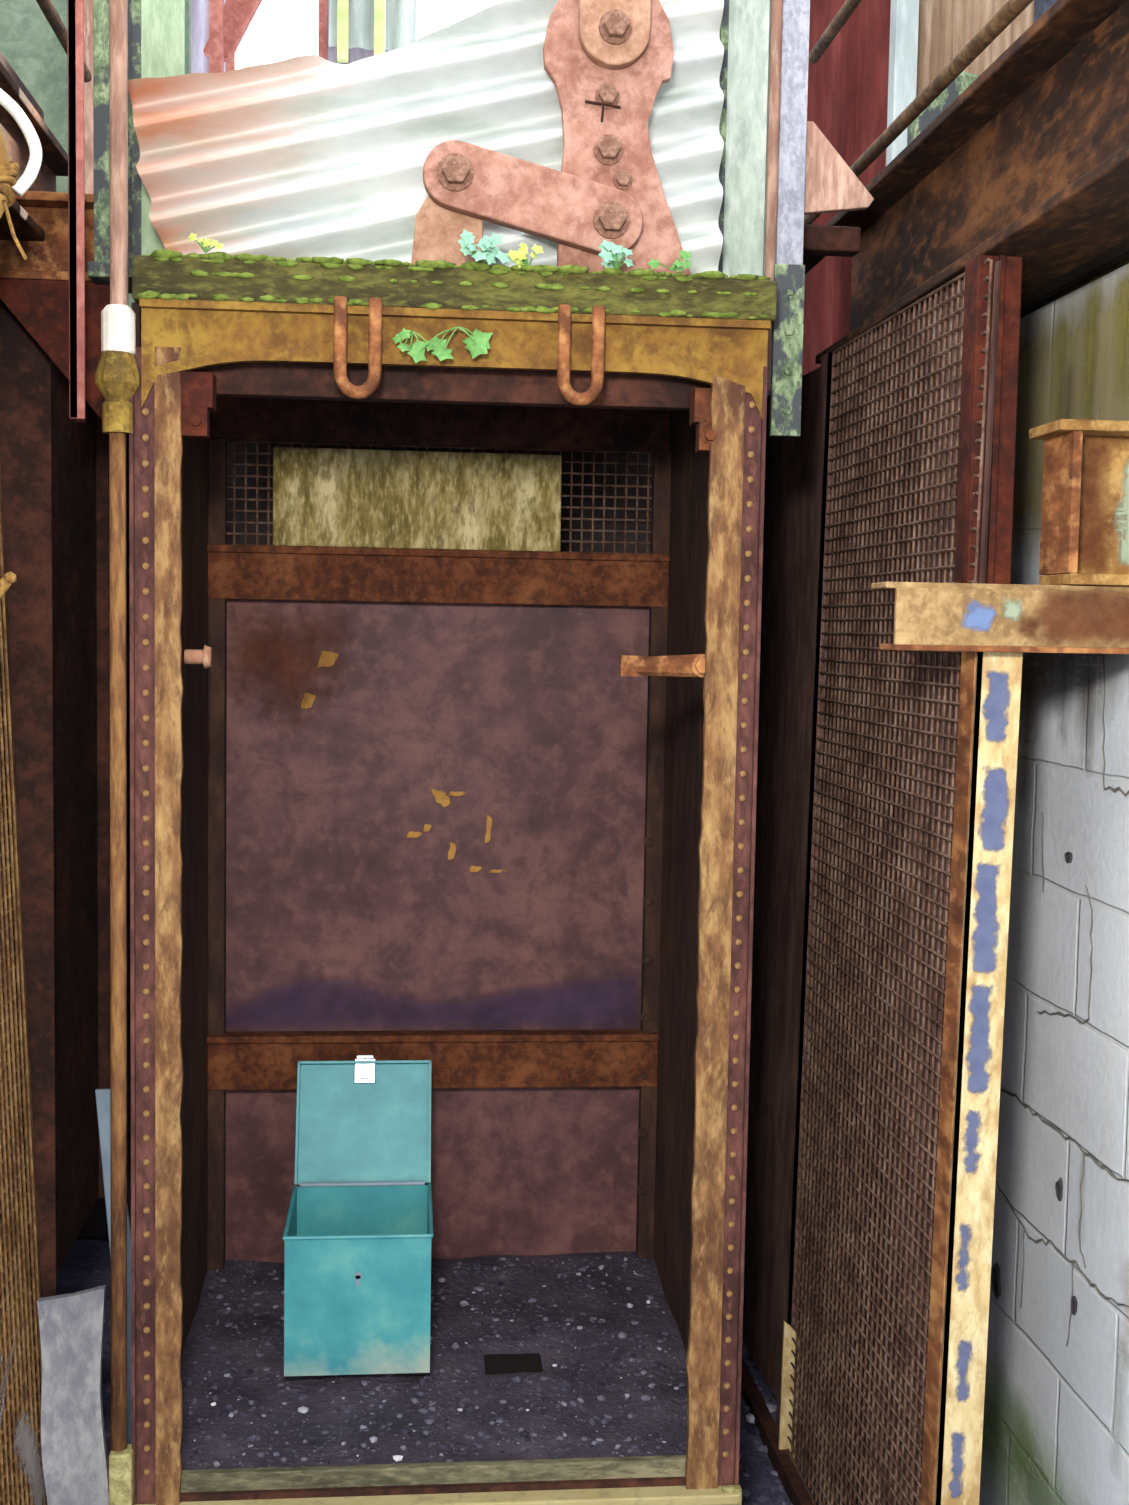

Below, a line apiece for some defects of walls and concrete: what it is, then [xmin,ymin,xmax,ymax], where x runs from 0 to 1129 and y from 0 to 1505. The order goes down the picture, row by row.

mould [982,1397,1031,1486]